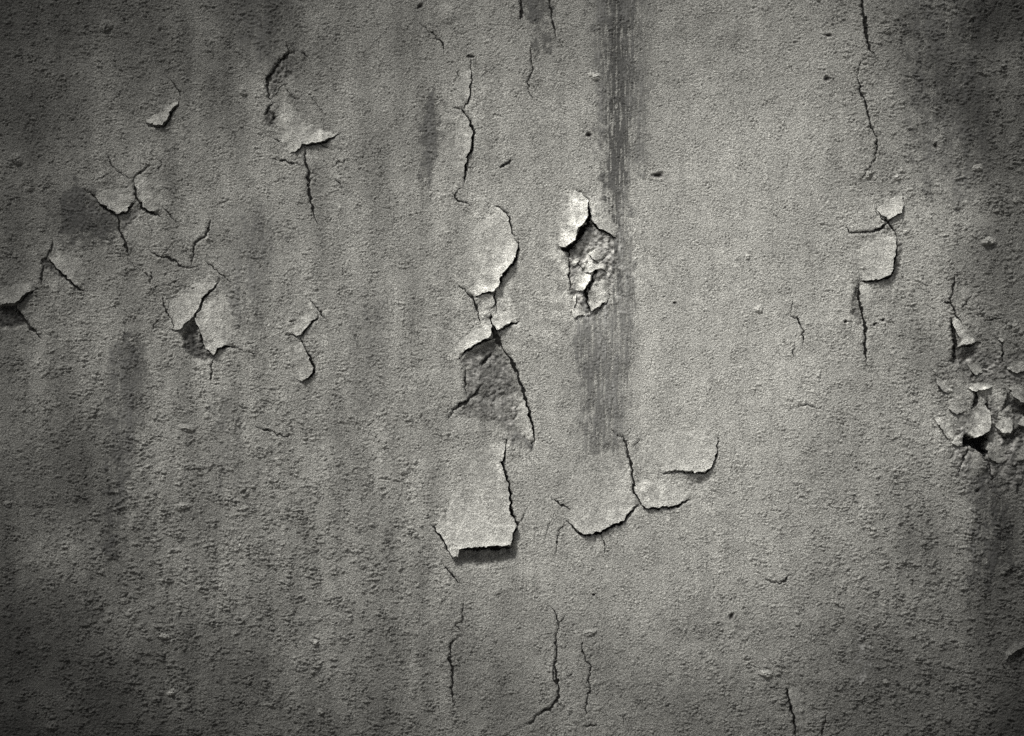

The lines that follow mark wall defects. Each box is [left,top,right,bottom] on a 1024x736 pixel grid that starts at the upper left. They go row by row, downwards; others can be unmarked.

peeling [84,153,257,381]
peeling [264,41,347,224]
crack [519,0,556,100]
peeling [557,190,624,318]
water stain [572,0,647,445]
crack [857,0,878,181]
peeling [844,191,904,365]
peeling [431,205,535,562]
peeling [933,273,1024,494]
peeling [544,424,719,553]
crack [443,564,464,708]
crack [516,605,597,730]